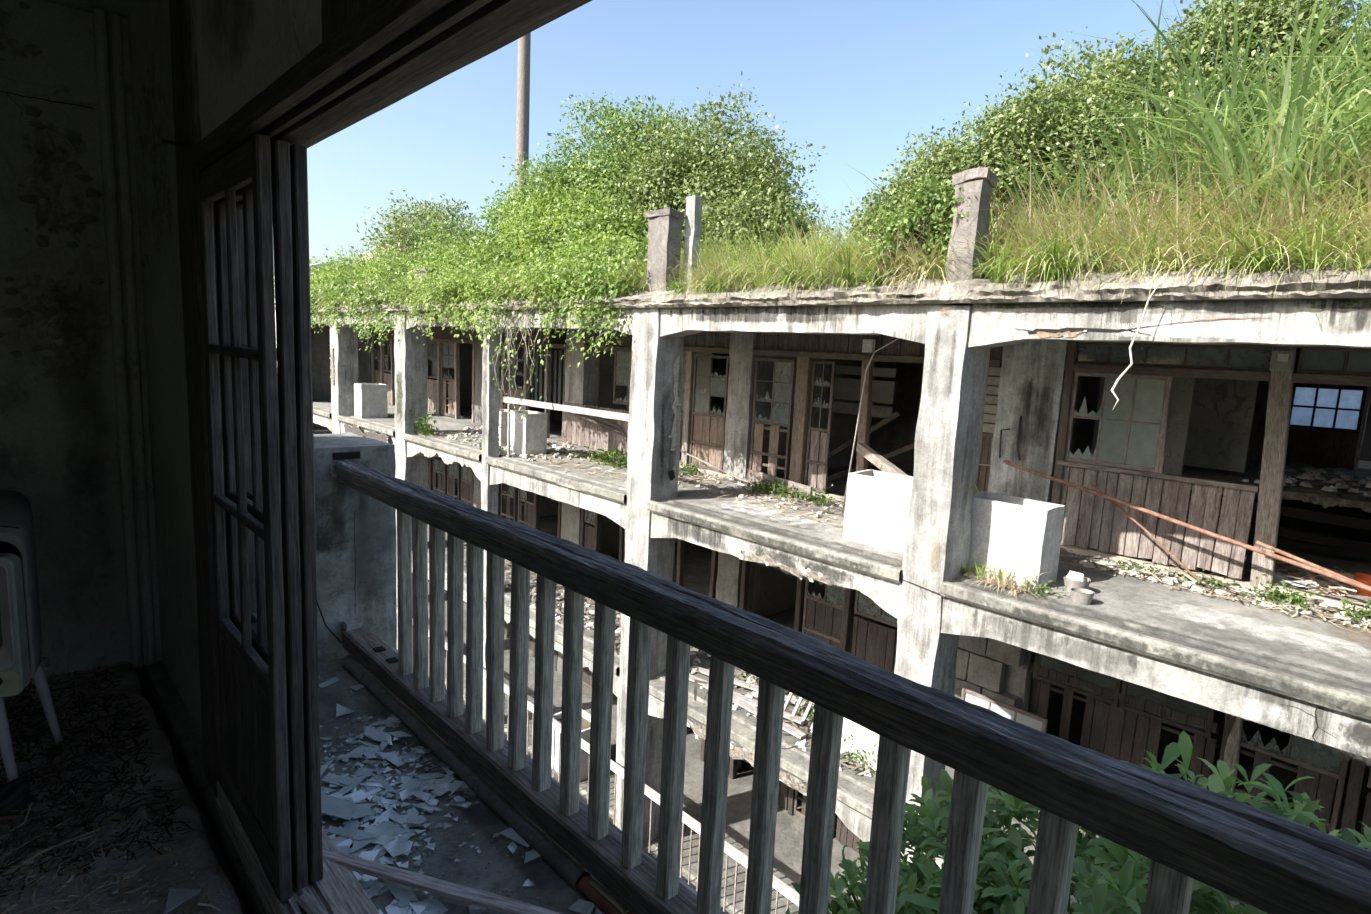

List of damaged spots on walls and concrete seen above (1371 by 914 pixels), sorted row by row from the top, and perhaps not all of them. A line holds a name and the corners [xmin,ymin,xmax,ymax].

crack [1017,317,1270,335]